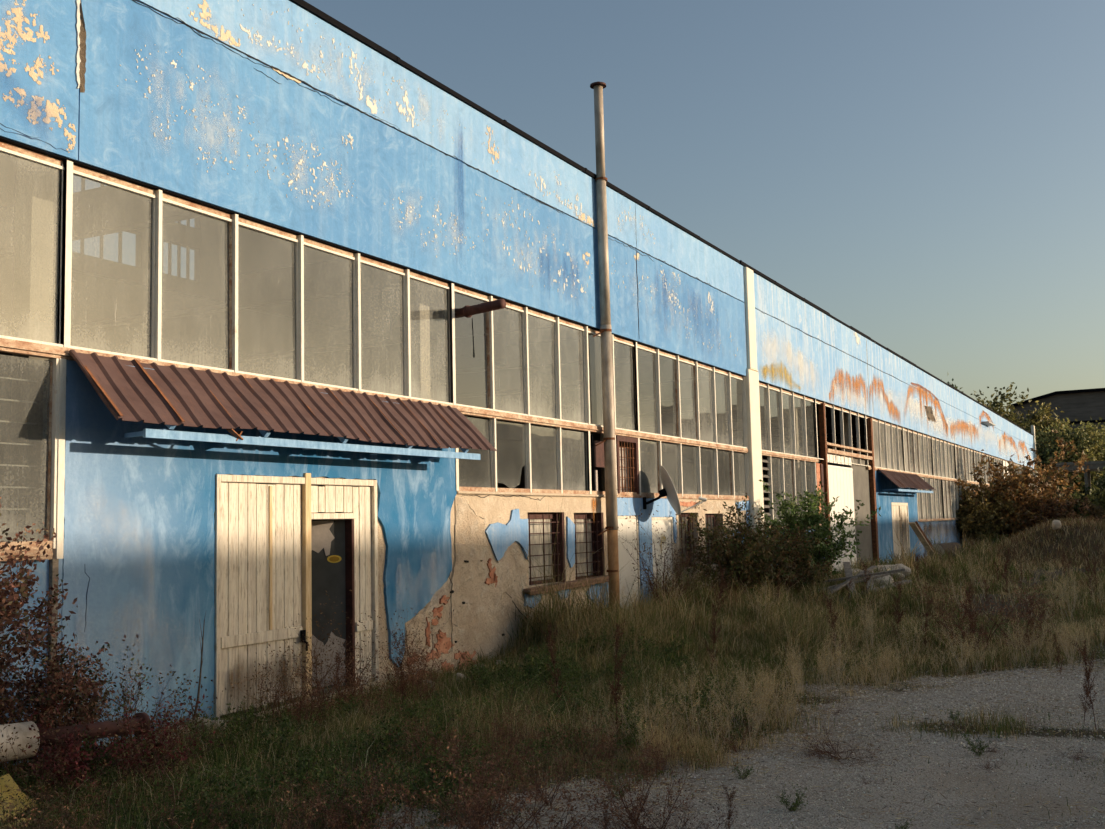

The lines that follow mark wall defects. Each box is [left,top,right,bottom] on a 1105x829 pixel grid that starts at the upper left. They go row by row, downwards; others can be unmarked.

peeling [0,0,76,153]
peeling [187,0,448,133]
peeling [117,44,357,209]
peeling [482,126,500,172]
peeling [384,191,488,257]
peeling [476,194,592,298]
peeling [528,171,596,227]
corrosion [763,366,800,387]
corrosion [829,373,900,417]
corrosion [907,383,1031,459]
spalling [378,497,591,685]